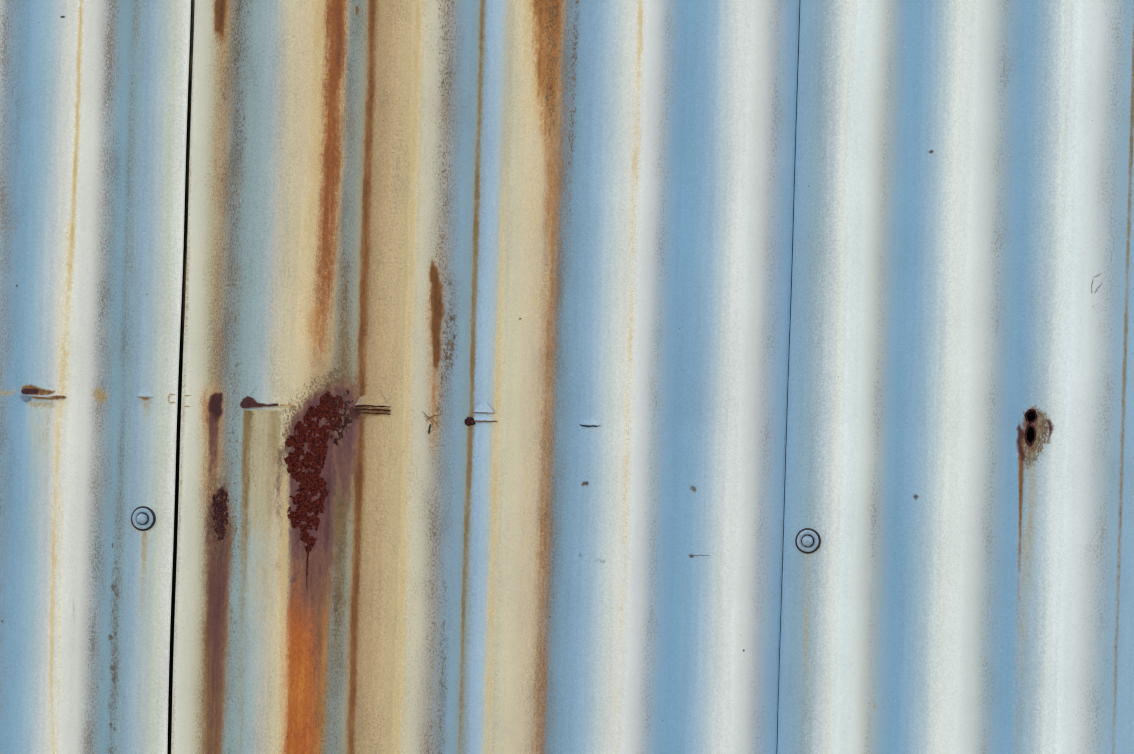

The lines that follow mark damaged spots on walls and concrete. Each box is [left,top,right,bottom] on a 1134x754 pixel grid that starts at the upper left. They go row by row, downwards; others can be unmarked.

corrosion [214,0,227,45]
corrosion [276,0,376,754]
corrosion [428,0,485,734]
corrosion [520,0,579,386]
corrosion [202,393,237,754]